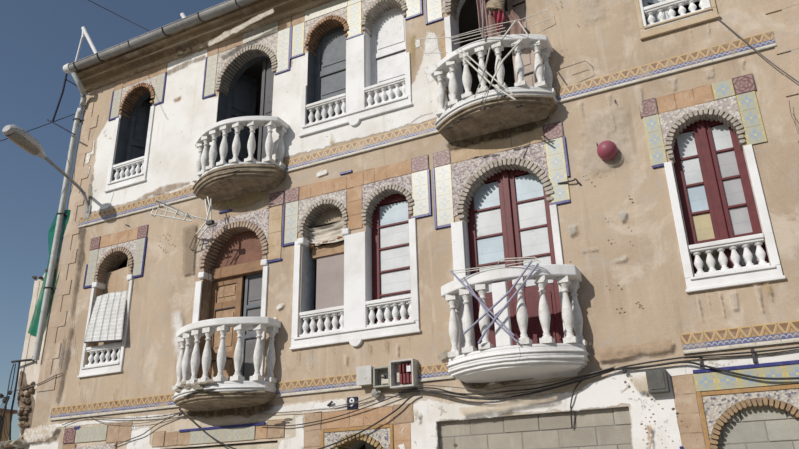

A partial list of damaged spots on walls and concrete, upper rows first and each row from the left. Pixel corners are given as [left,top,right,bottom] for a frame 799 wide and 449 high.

peeling [415,31,446,83]
water stain [71,227,84,314]
water stain [56,328,72,401]
spalling [17,381,56,442]
peeling [460,395,557,415]
peeling [624,376,670,449]